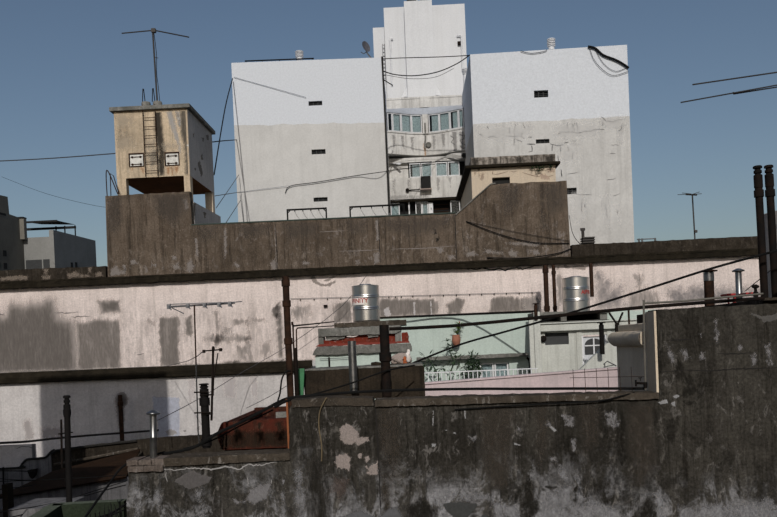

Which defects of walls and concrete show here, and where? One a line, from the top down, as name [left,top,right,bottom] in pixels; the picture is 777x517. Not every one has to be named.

crack [451,117,623,177]
leakage [0,298,121,373]
leakage [148,302,312,367]
peeling [335,423,378,475]